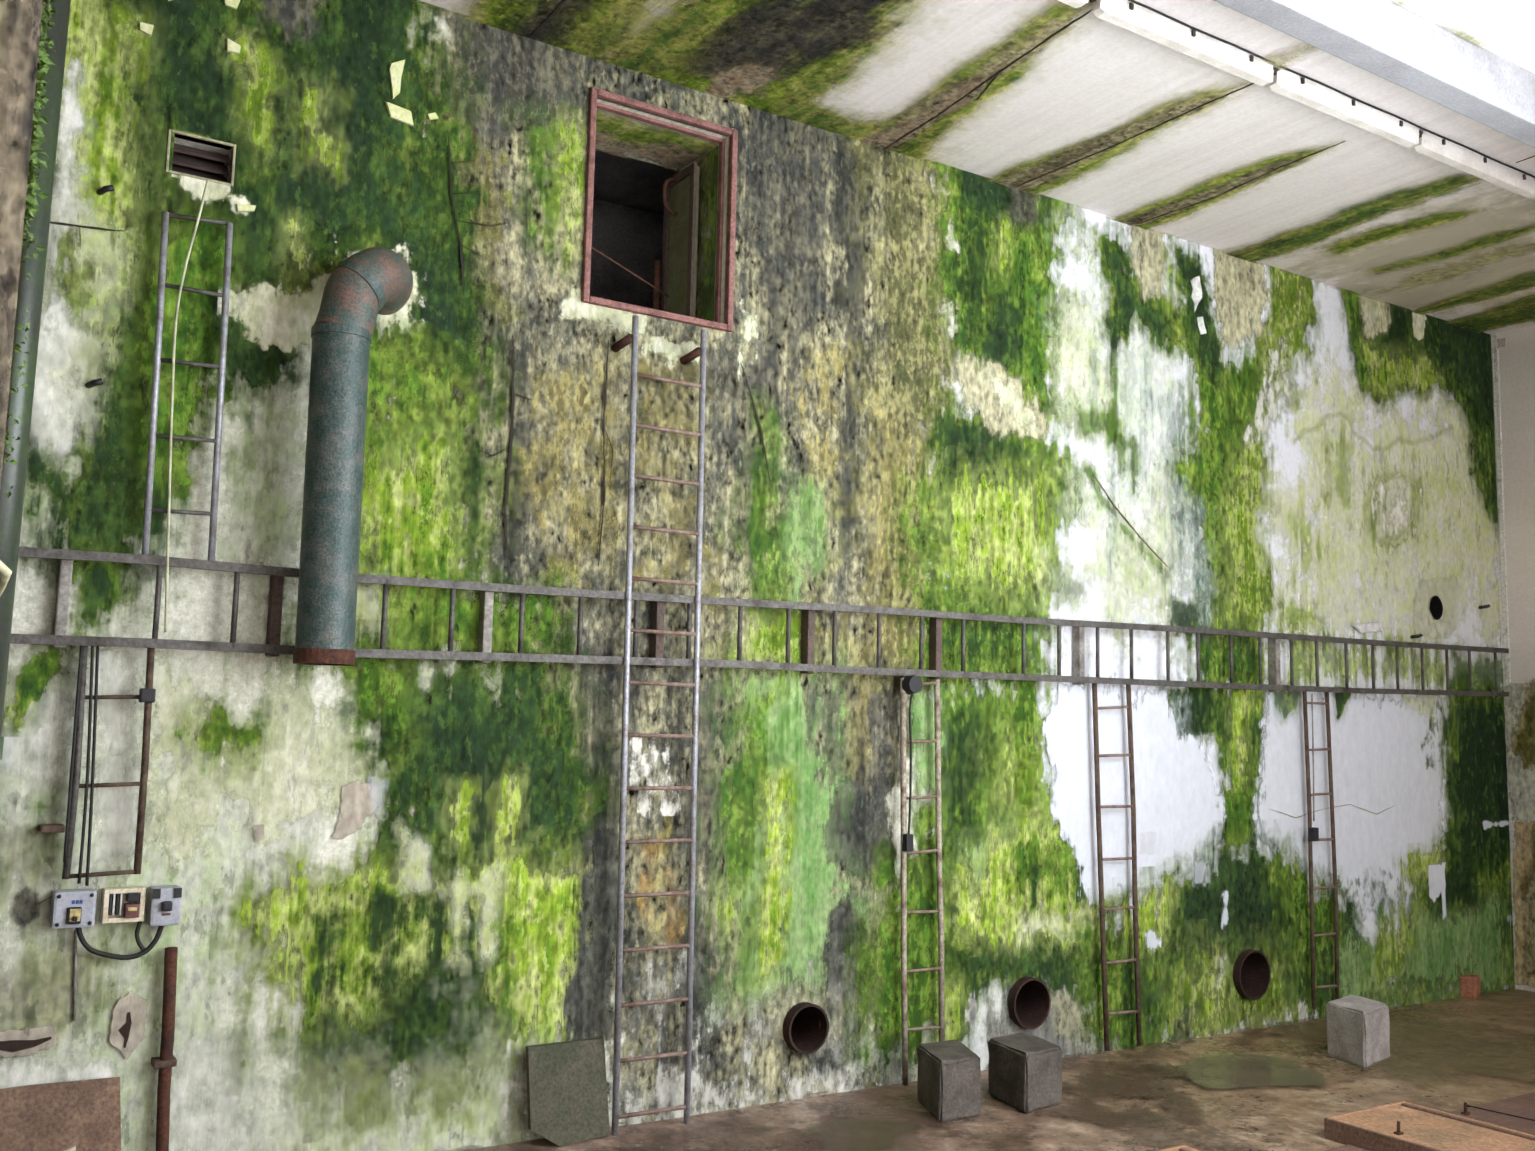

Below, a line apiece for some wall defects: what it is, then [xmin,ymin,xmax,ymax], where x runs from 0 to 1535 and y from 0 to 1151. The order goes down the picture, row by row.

damp [1328,210,1479,254]
damp [1372,226,1535,292]
peeling [1244,340,1290,441]
peeling [1371,469,1422,546]
damp [629,737,681,816]
peeling [1042,674,1227,907]
peeling [1252,681,1447,924]
damp [563,810,628,1041]
damp [627,762,912,1125]
flaking render [0,991,148,1089]